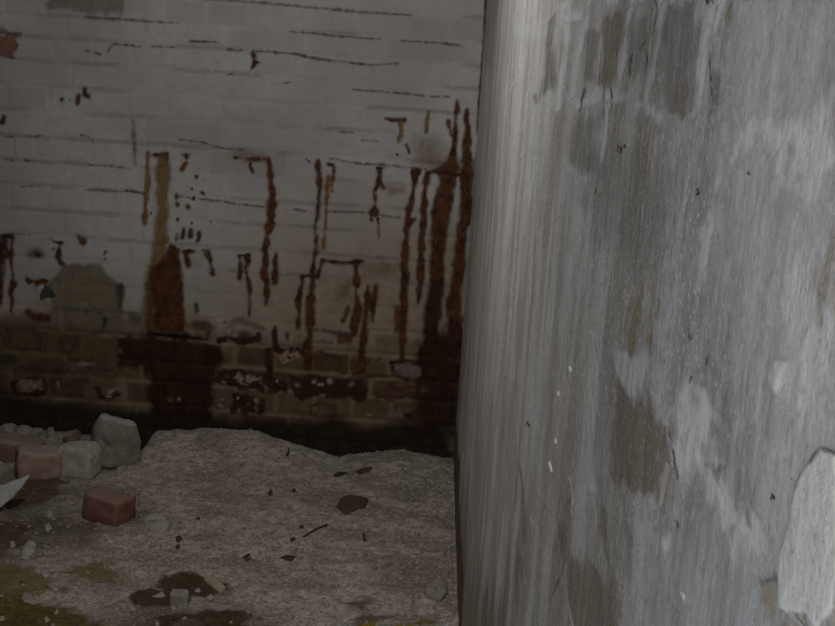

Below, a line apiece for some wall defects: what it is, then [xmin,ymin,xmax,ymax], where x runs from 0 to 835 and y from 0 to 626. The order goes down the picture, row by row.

corrosion [0,234,17,312]
corrosion [118,151,222,420]
corrosion [234,156,278,316]
corrosion [295,159,378,380]
corrosion [369,167,385,237]
corrosion [385,118,410,156]
corrosion [394,100,474,434]
leakage [0,264,508,626]
peeling [760,450,835,626]